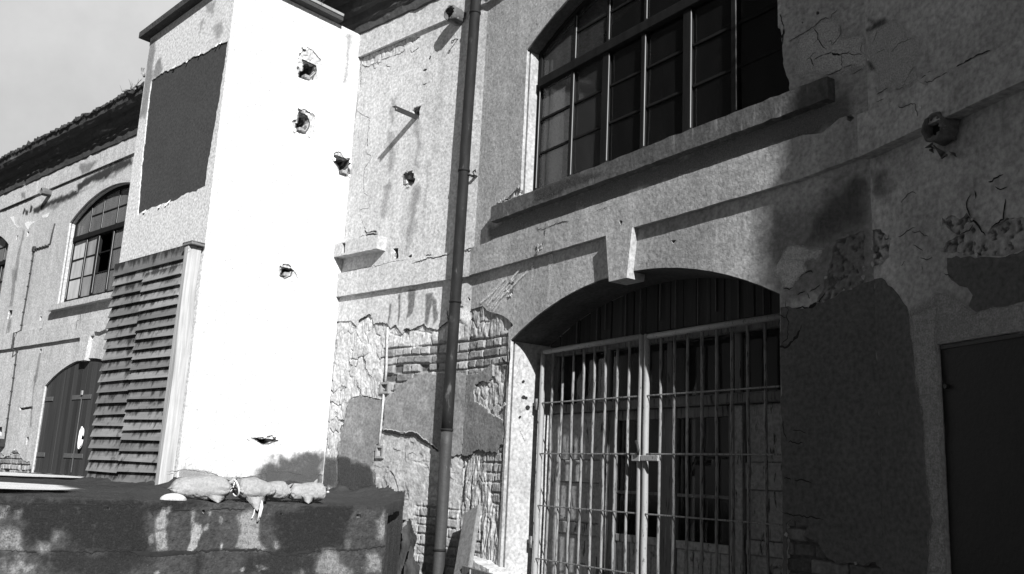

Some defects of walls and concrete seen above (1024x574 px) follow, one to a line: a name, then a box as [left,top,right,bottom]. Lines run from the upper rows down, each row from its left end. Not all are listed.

spalling [295,45,321,83]
crack [778,10,911,75]
crack [876,50,990,116]
spalling [292,104,314,137]
spalling [333,149,352,177]
crack [961,174,1006,236]
peeling [941,215,1024,258]
spalling [278,264,297,281]
peeling [819,229,890,303]
spalling [247,433,282,445]
peeling [323,298,534,574]